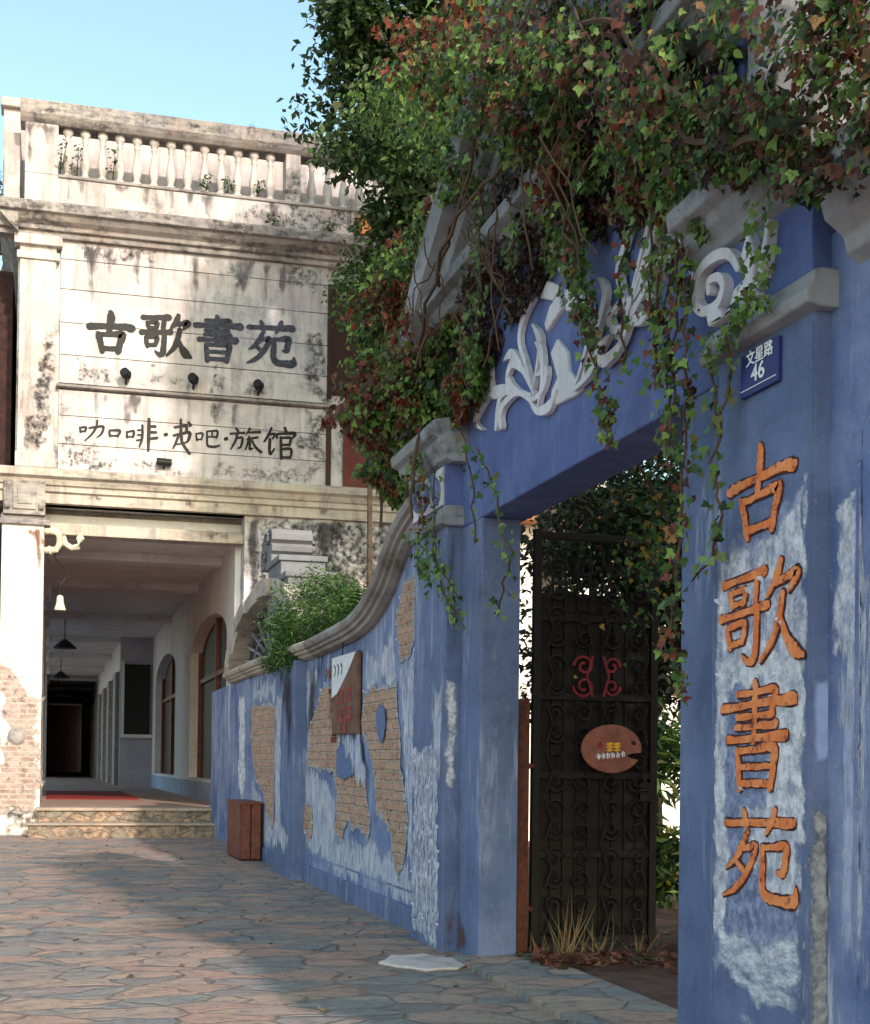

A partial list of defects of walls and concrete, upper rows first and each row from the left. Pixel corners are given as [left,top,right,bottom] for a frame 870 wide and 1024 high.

water stain [82,247,151,273]
water stain [231,262,316,290]
water stain [24,342,54,447]
water stain [306,334,326,401]
water stain [248,510,391,593]
flaking render [0,663,45,820]
flaking render [238,677,289,853]
flaking render [303,572,457,948]
peeling [713,475,830,1024]
peeling [833,489,870,960]